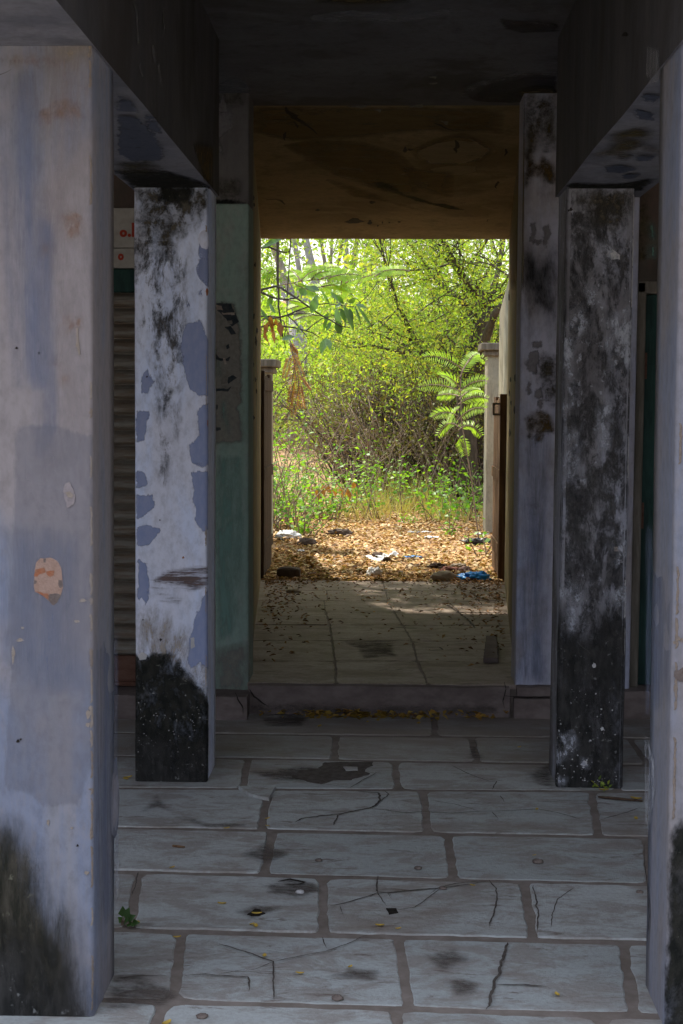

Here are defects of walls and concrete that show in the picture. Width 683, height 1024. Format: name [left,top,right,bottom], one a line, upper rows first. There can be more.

peeling [141,370,154,394]
peeling [135,411,150,442]
damp [509,136,652,789]
peeling [136,471,161,546]
spalling [34,557,63,605]
peeling [187,587,208,686]
damp [135,618,209,782]
crack [296,766,582,825]
damp [0,829,84,1017]
crack [185,936,363,997]
crack [331,877,542,1009]
crack [532,885,573,930]